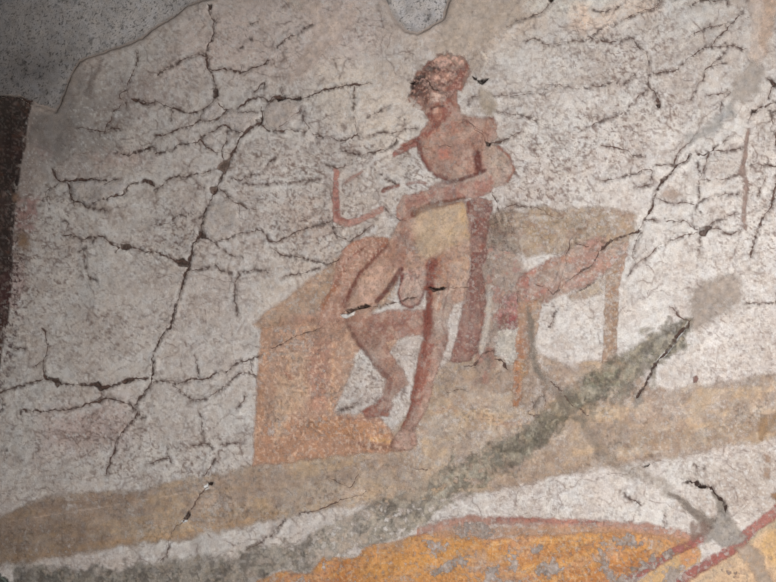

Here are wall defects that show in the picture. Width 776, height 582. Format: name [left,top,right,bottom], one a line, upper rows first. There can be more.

crack [591,0,744,126]
crack [468,82,612,144]
crack [0,6,415,474]
crack [536,142,776,294]
crack [636,307,691,398]
crack [160,442,236,561]
crack [303,474,366,513]
crack [687,481,727,512]
peeling [422,539,470,577]
peeling [481,550,521,582]
peeling [535,557,564,579]
peeling [598,533,686,582]